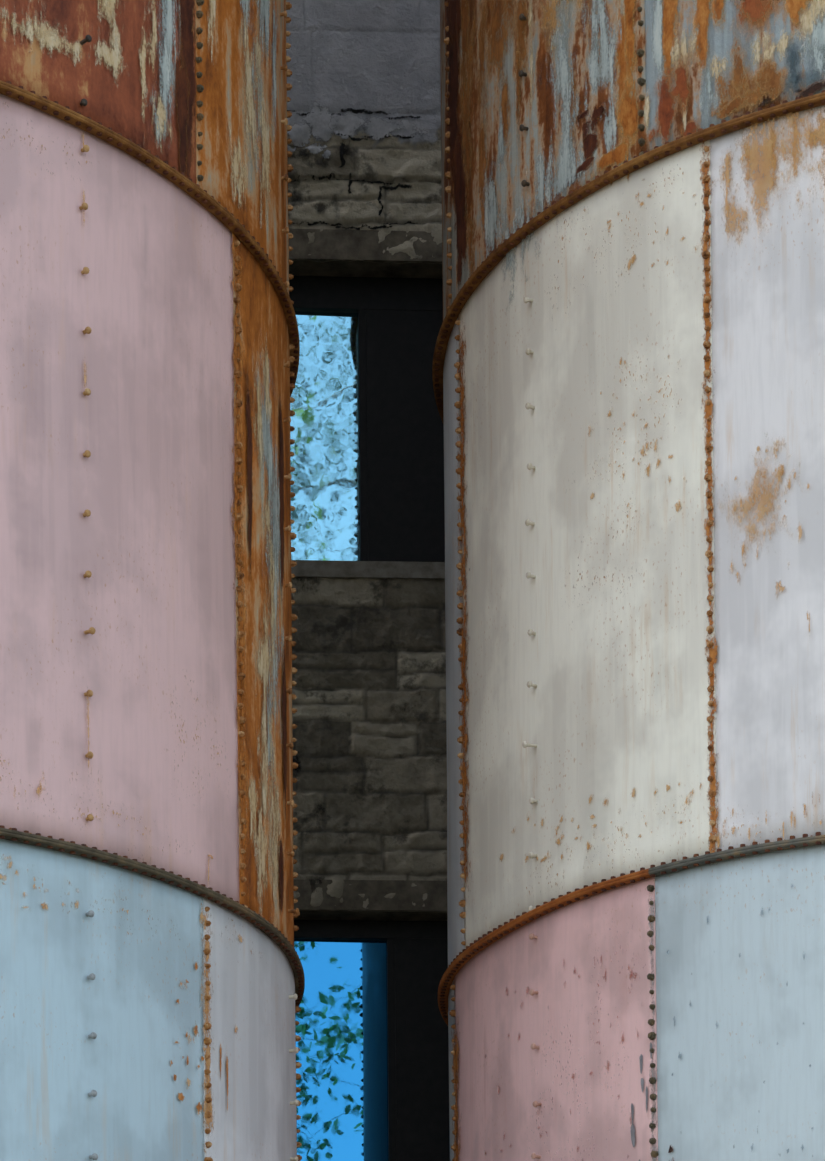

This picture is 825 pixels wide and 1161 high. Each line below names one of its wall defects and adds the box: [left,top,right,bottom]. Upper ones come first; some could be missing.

peeling [2,8,81,63]
peeling [95,0,122,77]
peeling [139,0,181,148]
rust [175,0,197,178]
peeling [229,0,427,218]
crack [287,108,422,230]
rust [567,0,825,853]
rust [231,232,253,899]
rust [456,328,470,884]
rust [525,817,590,887]